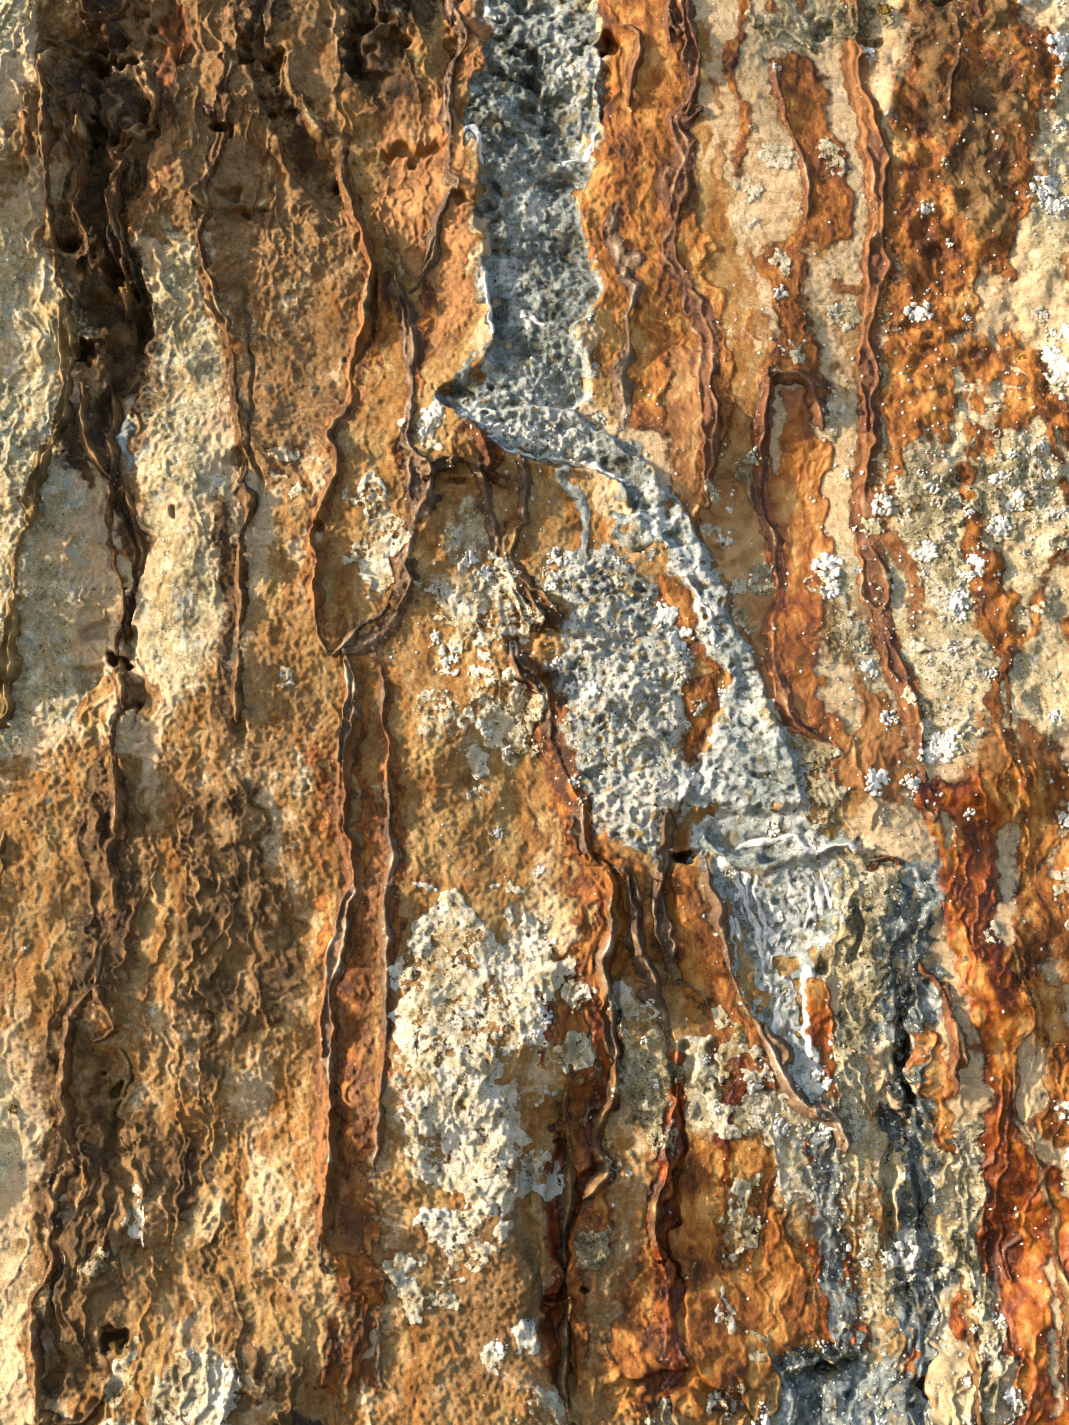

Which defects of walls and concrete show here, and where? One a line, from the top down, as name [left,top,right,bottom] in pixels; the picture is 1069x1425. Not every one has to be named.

leakage [0,0,222,1425]
leakage [166,0,991,1425]
corrosion [536,0,1069,1425]